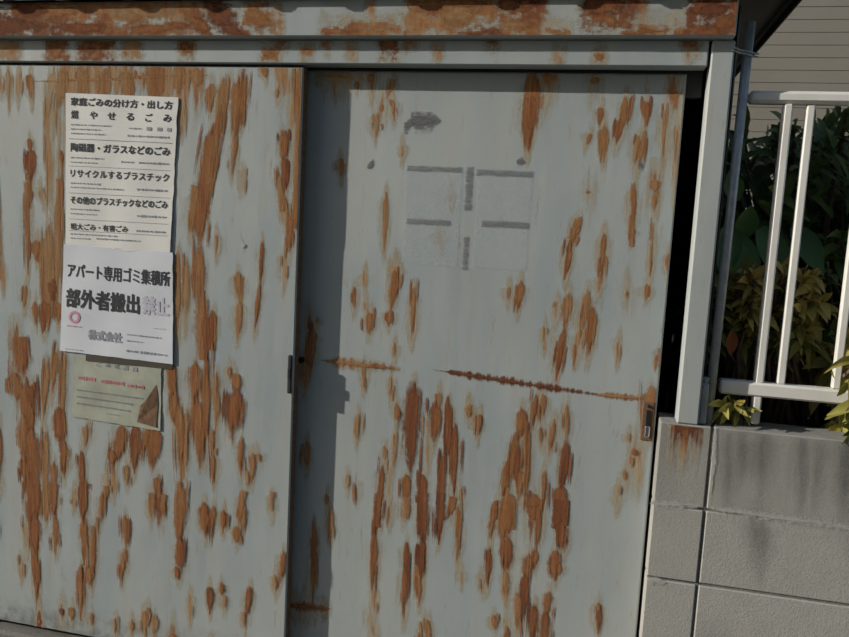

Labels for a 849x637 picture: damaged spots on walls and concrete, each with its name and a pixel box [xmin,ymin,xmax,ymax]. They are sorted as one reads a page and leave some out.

rust [319,0,738,64]
rust [521,73,557,163]
rust [583,75,683,304]
rust [0,0,314,637]
rust [350,187,418,362]
rust [505,274,525,317]
rust [541,216,610,385]
rust [290,490,336,624]
rust [367,371,464,637]
rust [478,389,572,637]
rust [612,379,656,514]
rust [668,425,703,466]